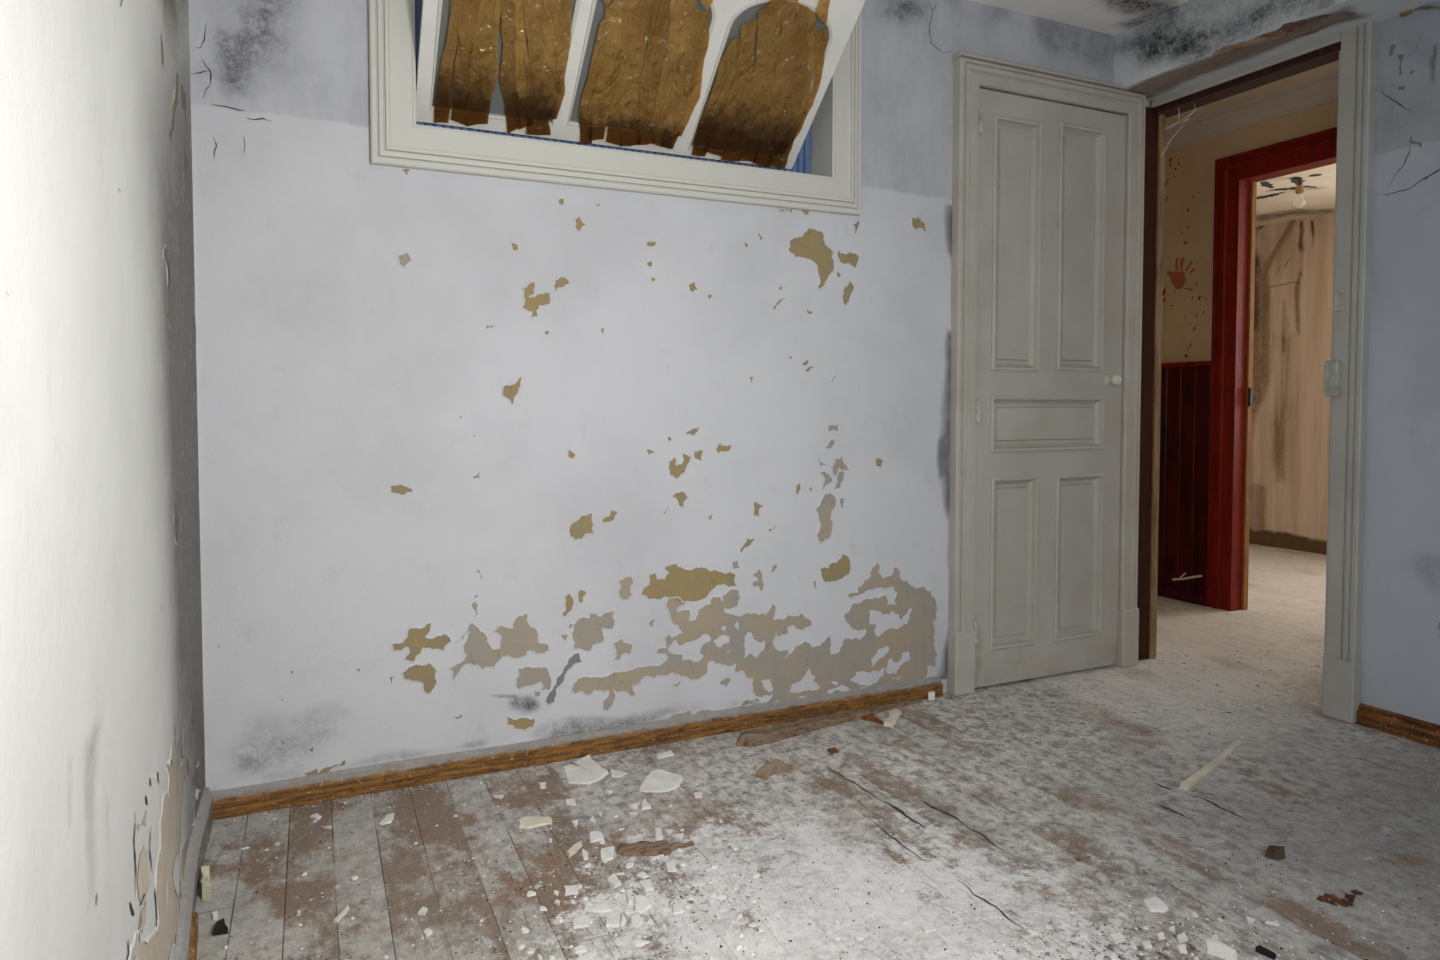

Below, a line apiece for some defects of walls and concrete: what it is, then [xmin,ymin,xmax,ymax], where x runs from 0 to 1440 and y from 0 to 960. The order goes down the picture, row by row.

leakage [1110,0,1202,57]
crack [192,27,269,155]
crack [1378,93,1440,195]
peeling [780,209,859,306]
peeling [391,485,412,495]
peeling [567,511,617,542]
peeling [646,427,731,515]
peeling [752,500,775,532]
peeling [796,425,849,544]
peeling [389,539,938,732]
peeling [128,733,206,960]